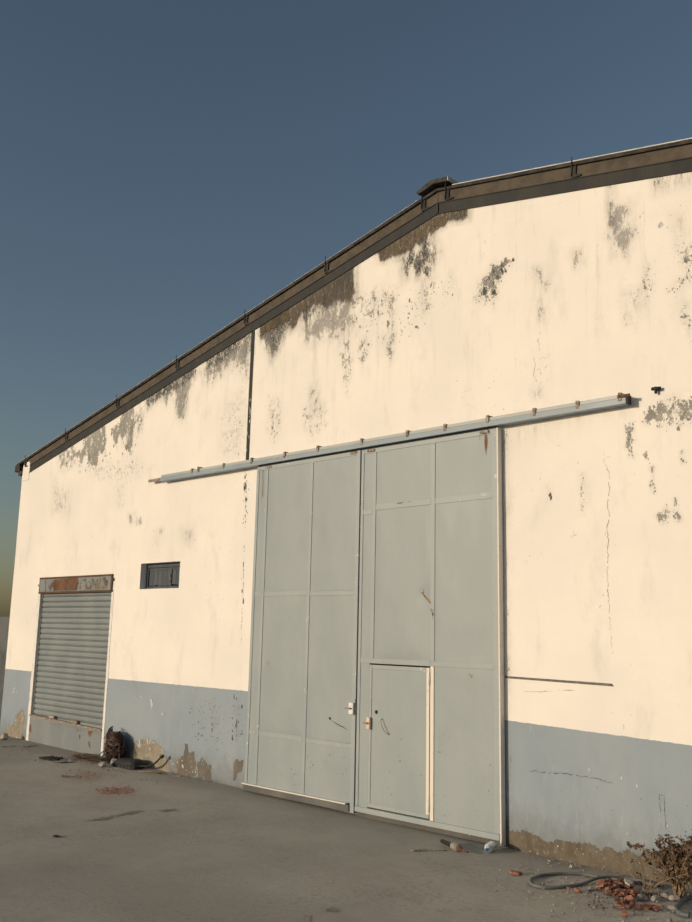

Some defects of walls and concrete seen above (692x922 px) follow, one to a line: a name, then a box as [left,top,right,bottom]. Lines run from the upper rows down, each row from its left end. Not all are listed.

damp [608,203,639,253]
damp [146,209,468,420]
rust [45,577,109,592]
spalling [5,710,25,739]
spalling [131,697,244,781]
damp [505,818,680,885]